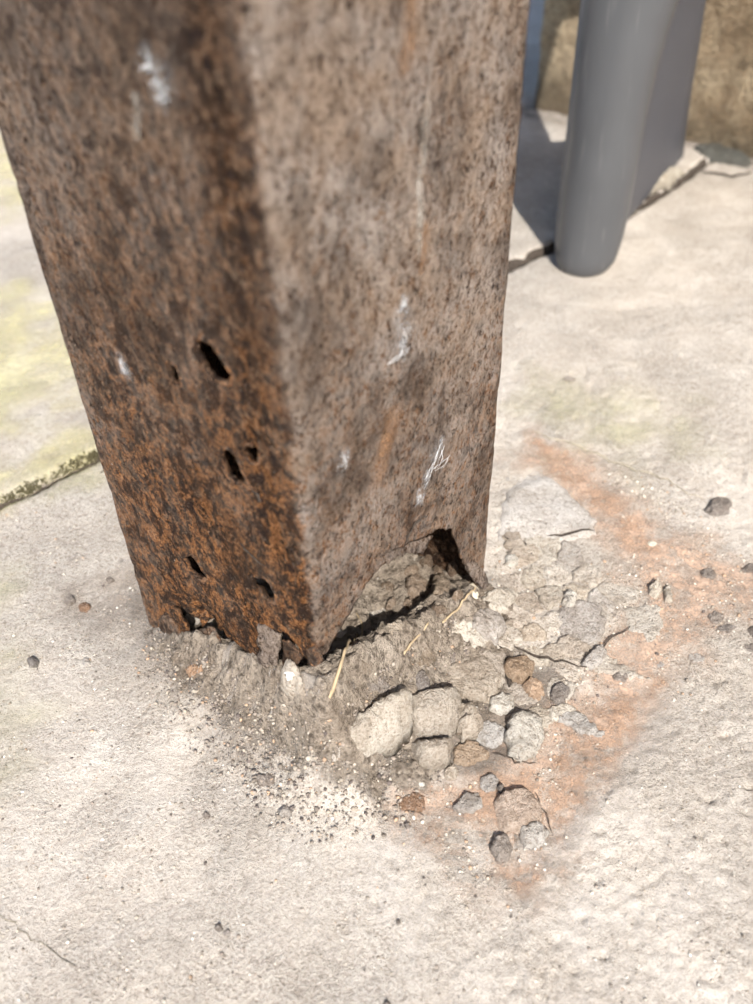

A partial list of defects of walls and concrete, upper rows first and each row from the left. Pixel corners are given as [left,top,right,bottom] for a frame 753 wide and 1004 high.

corrosion [380,535,433,564]
corrosion [158,612,181,636]
corrosion [256,623,324,668]
corrosion [404,438,753,846]
spalling [612,672,628,683]